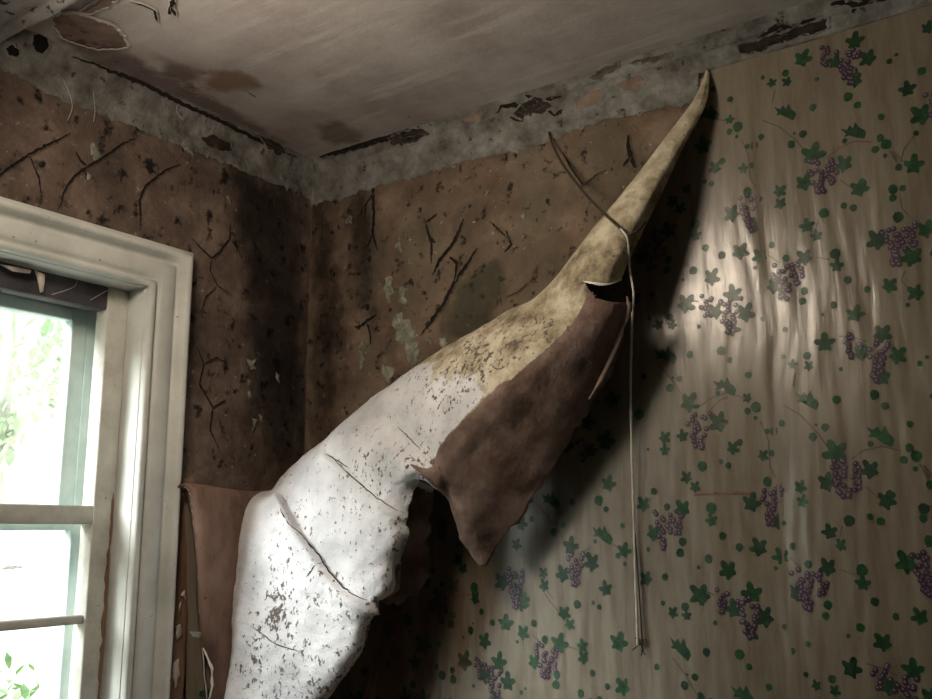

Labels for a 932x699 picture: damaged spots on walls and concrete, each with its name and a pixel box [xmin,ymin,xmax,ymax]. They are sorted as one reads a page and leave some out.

spalling [2,0,131,62]
spalling [735,16,832,56]
crack [0,132,136,207]
crack [137,162,181,230]
spalling [198,131,234,153]
spalling [386,127,432,149]
crack [489,220,514,253]
crack [420,213,478,337]
crack [354,314,377,345]
peeling [383,276,448,366]
crack [194,342,227,453]